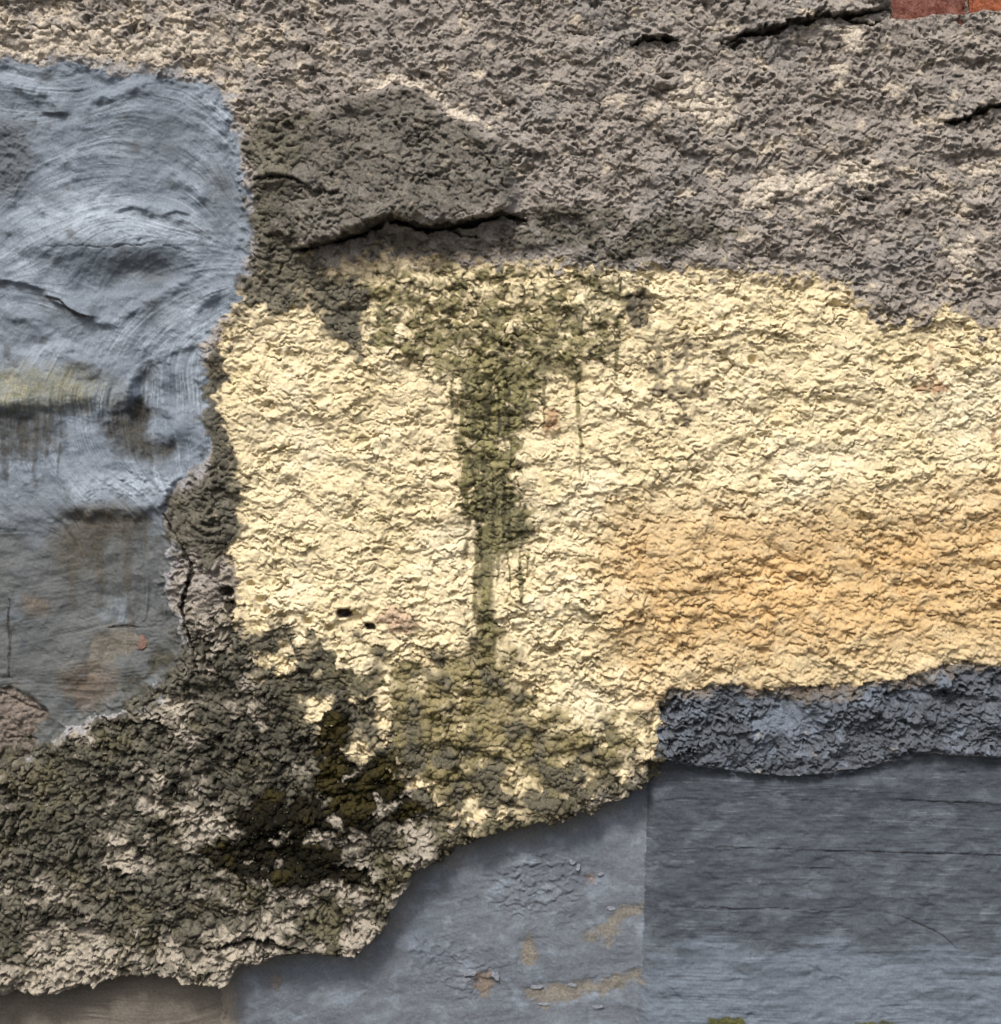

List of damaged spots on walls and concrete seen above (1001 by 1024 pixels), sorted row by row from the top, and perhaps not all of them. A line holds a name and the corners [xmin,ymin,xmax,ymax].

crack [630,33,679,47]
crack [721,9,881,51]
crack [920,103,1001,131]
crack [296,210,527,251]
spalling [106,398,175,460]
leakage [450,377,463,426]
leakage [575,367,583,473]
leakage [457,439,530,675]
spalling [220,586,236,611]
spalling [0,687,48,765]
leakage [199,709,426,888]
peeling [461,969,500,995]